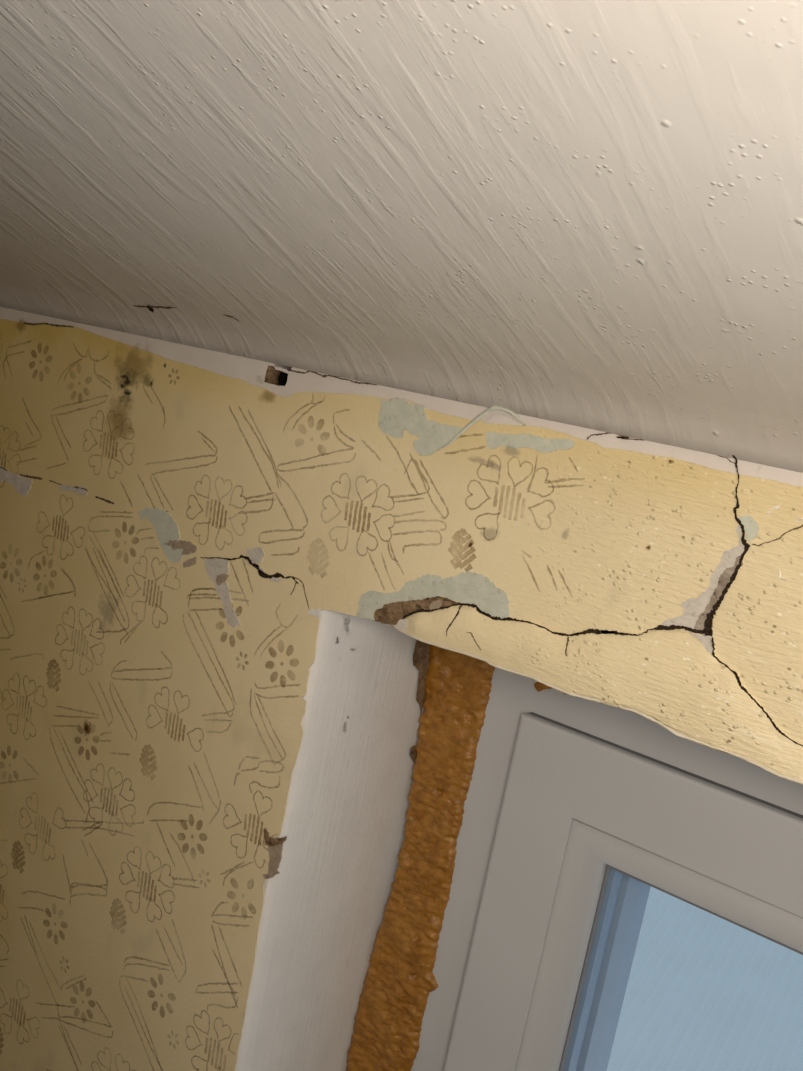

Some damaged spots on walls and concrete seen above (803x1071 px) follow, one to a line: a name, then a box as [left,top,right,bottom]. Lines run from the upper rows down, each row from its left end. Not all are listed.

spalling [259,361,294,390]
peeling [378,398,576,456]
crack [0,467,114,504]
spalling [139,507,241,628]
crack [201,555,309,607]
spalling [356,571,510,633]
crack [402,455,803,746]
spalling [662,515,759,655]
peeling [413,640,430,714]
spalling [263,829,287,879]